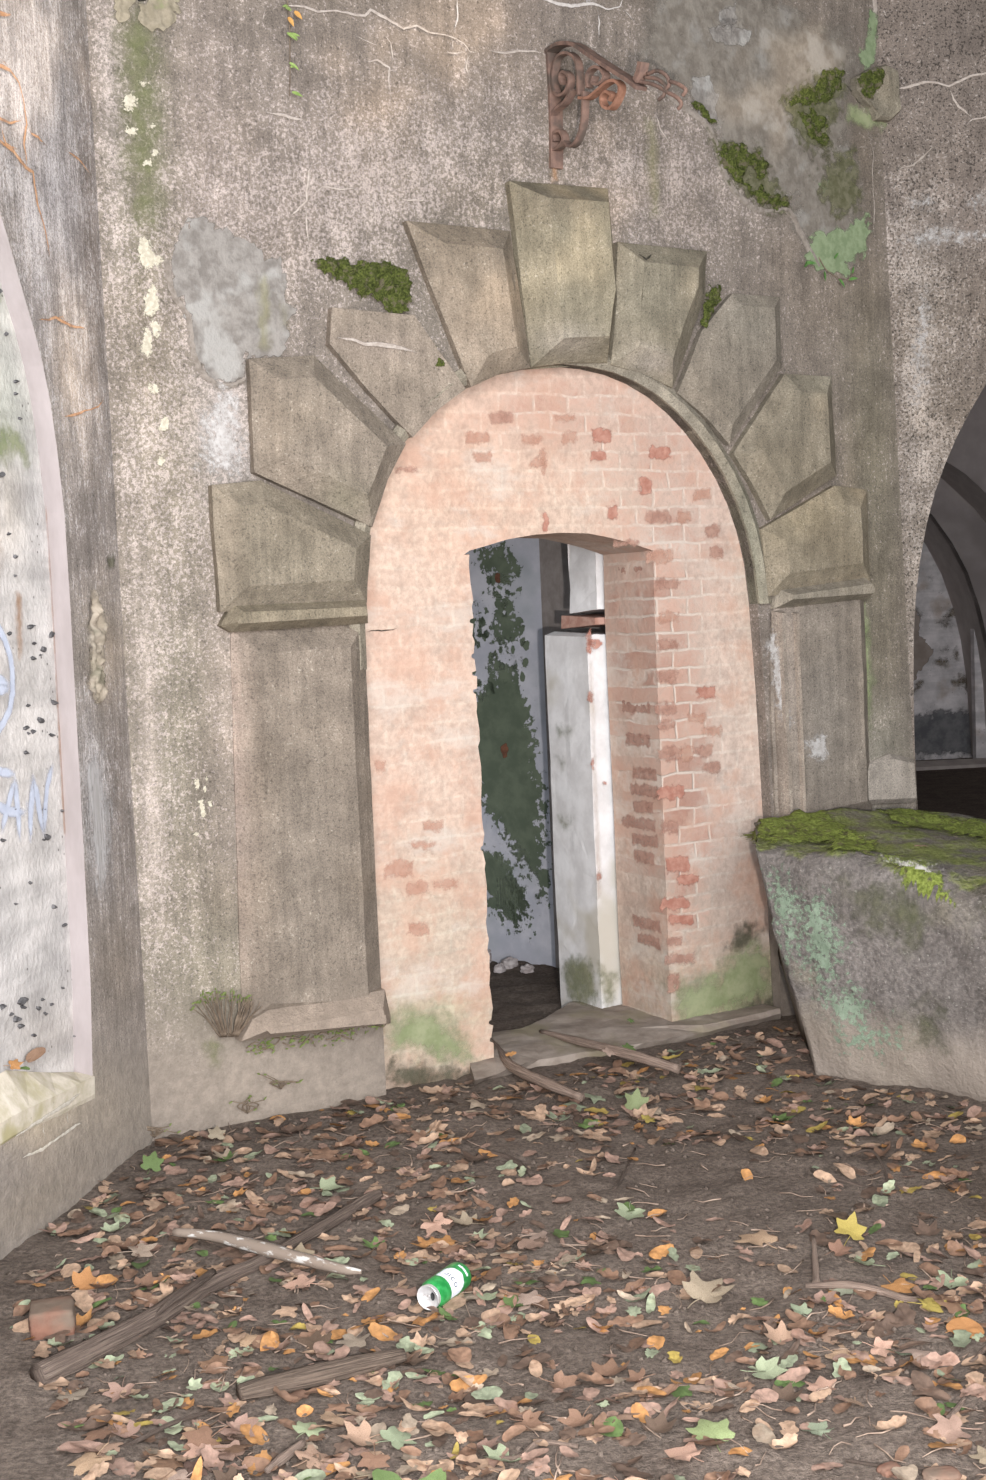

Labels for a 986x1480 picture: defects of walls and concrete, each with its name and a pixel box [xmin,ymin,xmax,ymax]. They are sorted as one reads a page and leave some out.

crack [263,0,541,100]
crack [546,0,631,48]
crack [871,0,879,40]
crack [899,63,986,125]
crack [859,142,934,229]
spalling [163,216,297,389]
peeling [556,415,611,460]
peeling [649,445,671,460]
peeling [639,476,723,558]
spalling [914,610,933,680]
peeling [470,540,553,939]
peeling [914,709,972,755]